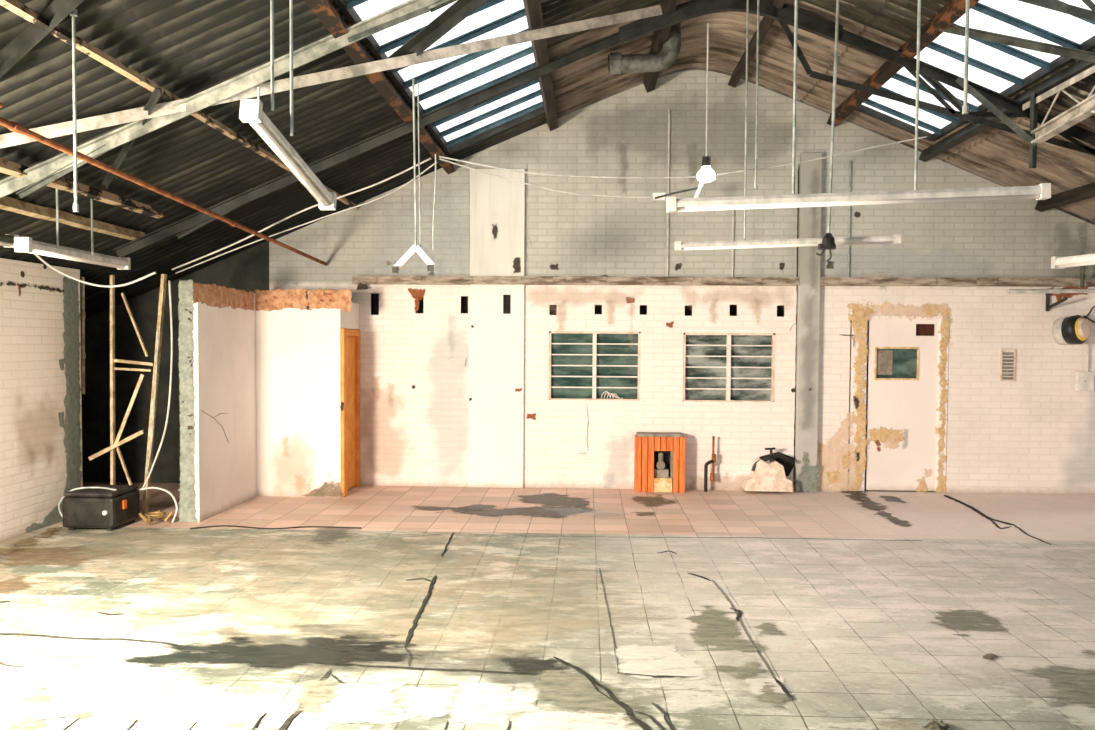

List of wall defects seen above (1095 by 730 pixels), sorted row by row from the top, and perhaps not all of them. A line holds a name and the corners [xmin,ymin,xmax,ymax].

spalling [178,280,379,522]
peeling [817,302,952,492]
crack [0,612,232,655]
crack [251,704,304,730]
water stain [329,634,403,652]
crack [295,532,694,730]
crack [639,537,921,700]